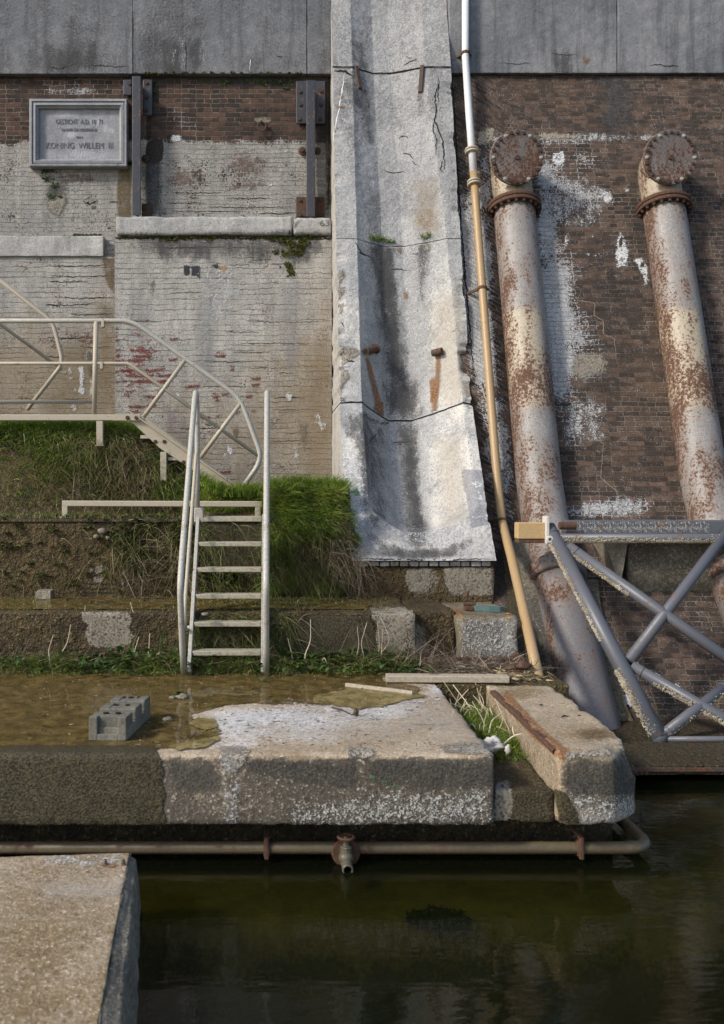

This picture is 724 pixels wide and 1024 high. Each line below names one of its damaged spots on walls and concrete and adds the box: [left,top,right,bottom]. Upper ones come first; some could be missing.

crack [385,78,445,173]
leakage [541,151,612,246]
leakage [615,233,648,283]
peeling [115,326,178,414]
corrosion [366,358,384,416]
leakage [345,244,464,558]
corrosion [430,357,440,413]
leakage [571,352,608,378]
leakage [581,499,642,517]
leakage [246,747,357,788]